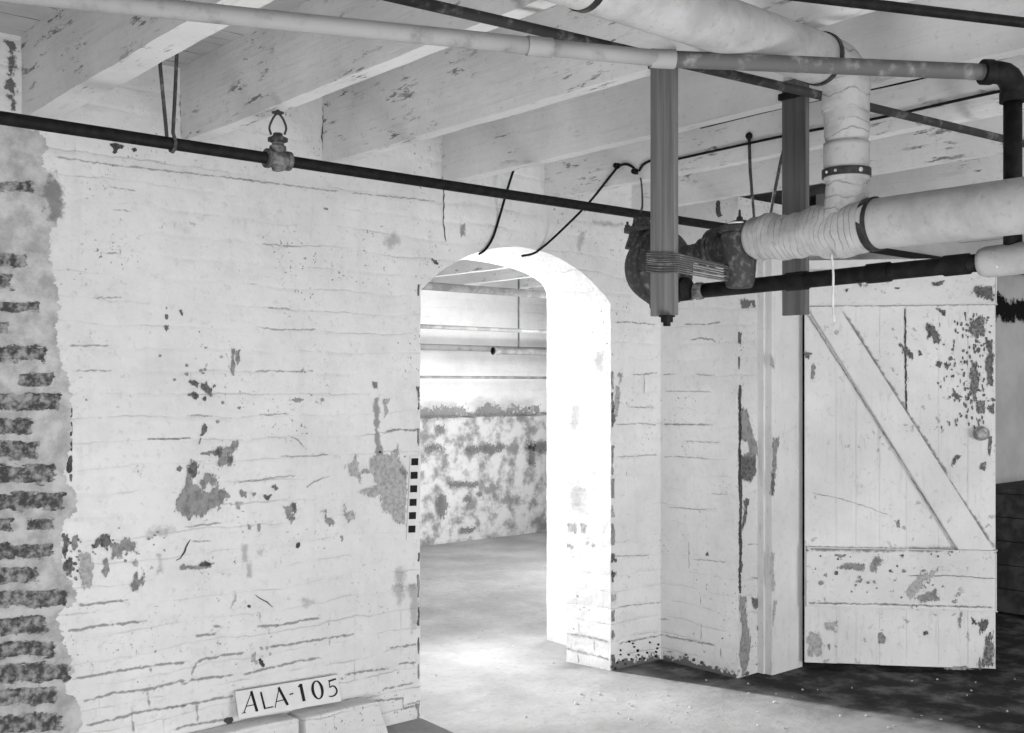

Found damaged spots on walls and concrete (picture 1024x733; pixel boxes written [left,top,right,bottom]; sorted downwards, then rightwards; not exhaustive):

peeling [925,307,995,429]
flaking render [0,125,165,733]
peeling [174,420,278,521]
peeling [345,445,408,525]
water stain [436,481,482,520]
water stain [420,402,540,456]
water stain [526,440,547,466]
peeling [980,436,992,471]
spalling [738,385,758,678]
peeling [818,553,940,604]
peeling [806,620,838,657]
peeling [959,612,996,670]